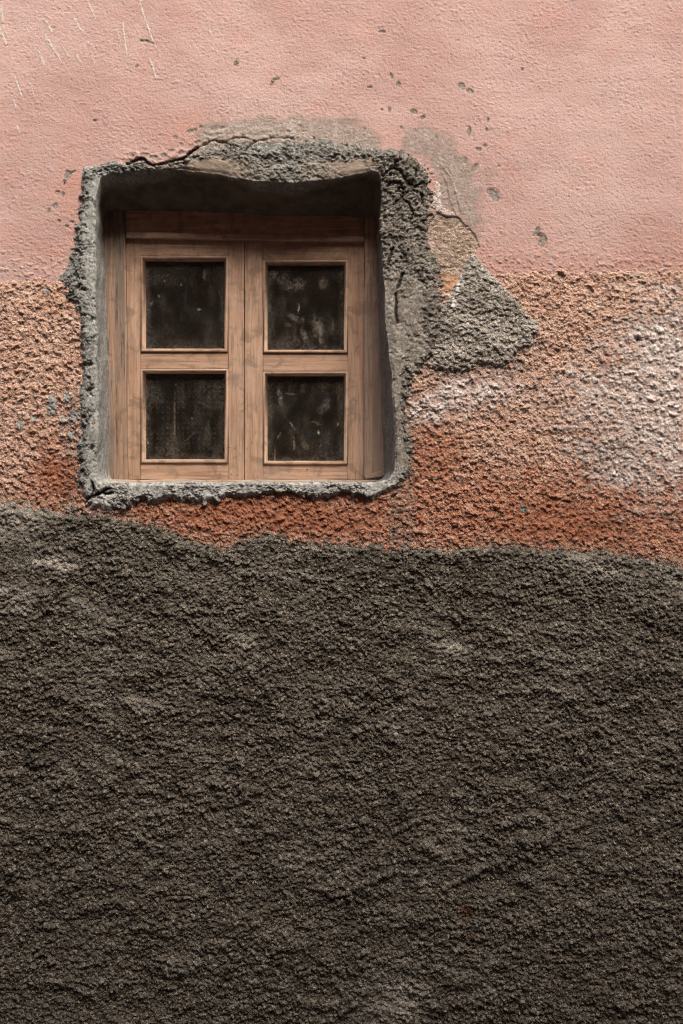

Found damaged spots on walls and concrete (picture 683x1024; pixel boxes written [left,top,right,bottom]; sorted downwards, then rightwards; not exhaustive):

crack [126,137,283,175]
peeling [425,181,539,374]